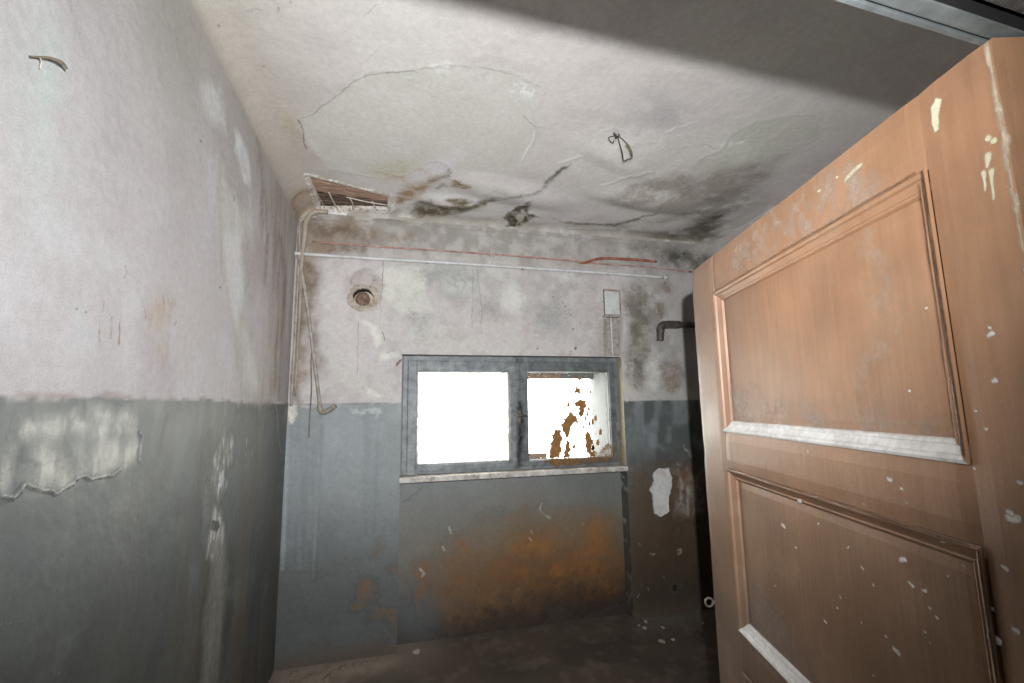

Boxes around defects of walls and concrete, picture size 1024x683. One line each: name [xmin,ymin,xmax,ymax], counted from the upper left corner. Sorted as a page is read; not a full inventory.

peeling [298,57,549,215]
flaking render [500,199,541,228]
leakage [550,147,801,399]
peeling [0,396,145,504]
leakage [196,123,586,683]
peeling [649,466,672,518]
rust [398,497,626,640]